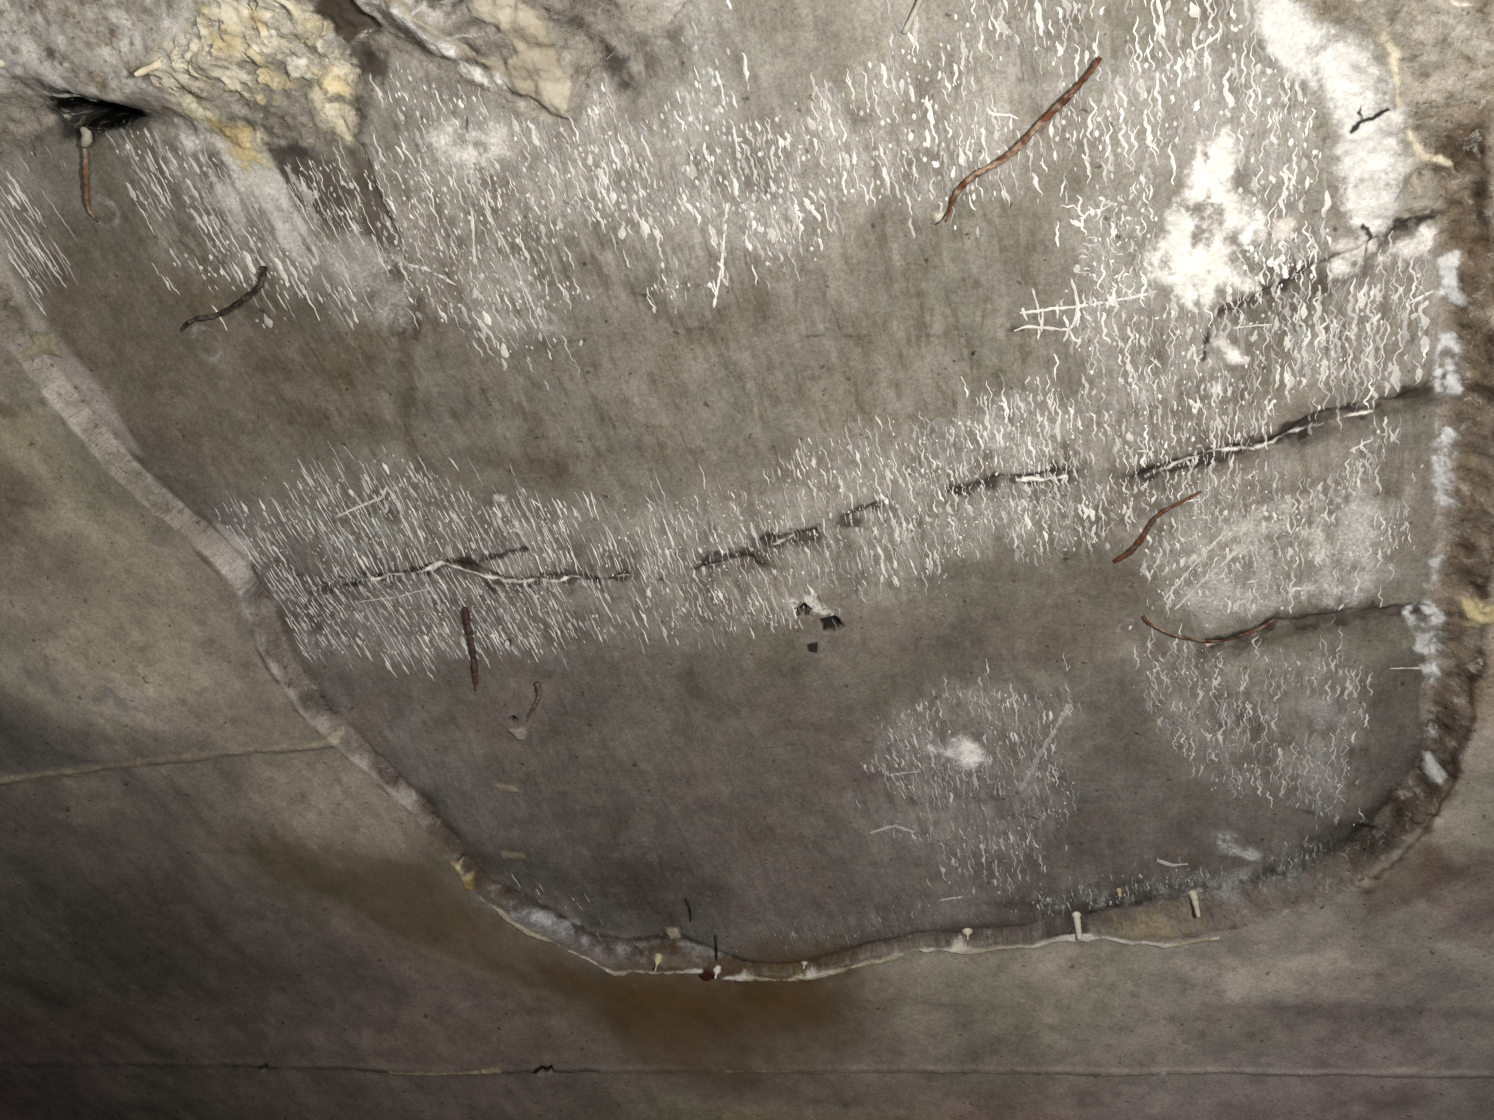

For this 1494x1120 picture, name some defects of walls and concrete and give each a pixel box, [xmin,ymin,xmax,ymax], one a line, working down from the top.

damp [39,24,67,49]
spalling [0,52,331,151]
spalling [288,0,573,119]
spalling [521,0,688,108]
damp [0,138,78,316]
crack [311,546,632,595]
damp [105,0,1453,981]
crack [695,501,885,569]
crack [946,462,1077,496]
crack [1131,371,1448,481]
spalling [1290,0,1494,776]
spalling [242,581,756,975]